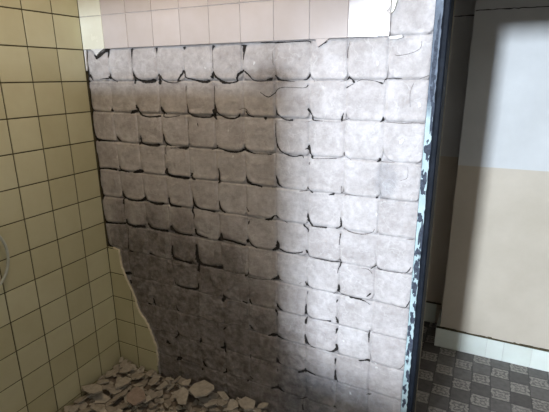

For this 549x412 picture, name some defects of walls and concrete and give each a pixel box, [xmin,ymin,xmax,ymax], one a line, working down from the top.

crack [87,49,144,199]
crack [131,45,351,165]
crack [261,40,328,57]
crack [345,76,401,88]
crack [165,168,196,180]
crack [105,191,257,290]
spalling [84,0,441,412]
crack [272,241,371,305]
crack [303,214,375,245]
crack [299,281,339,382]